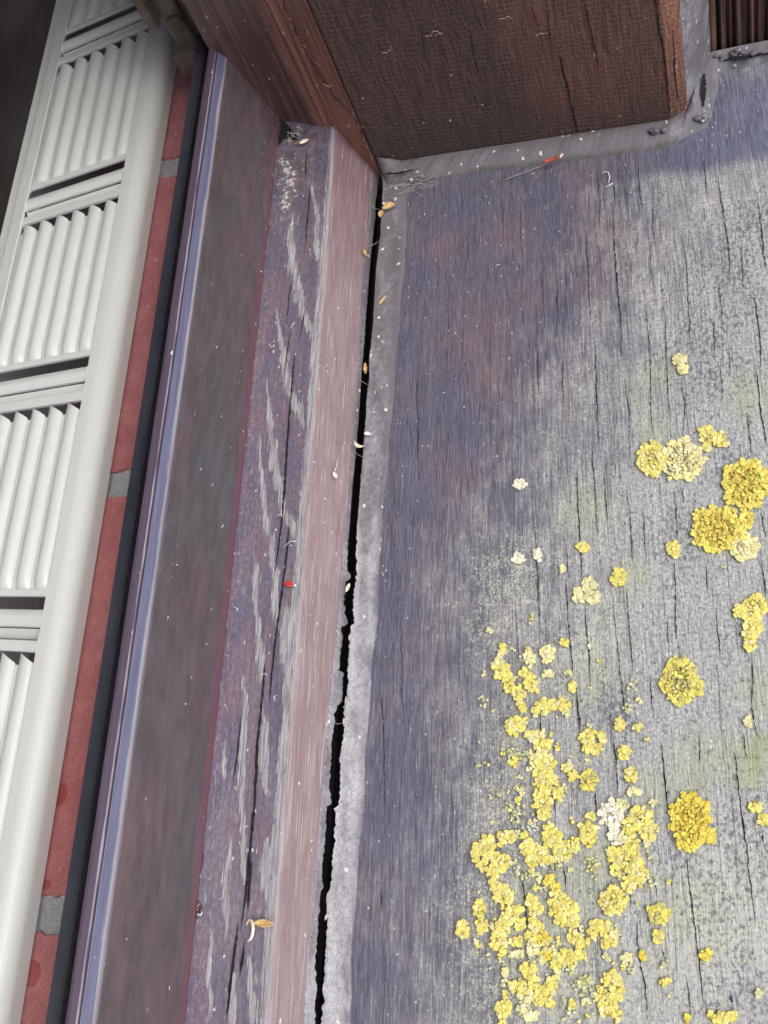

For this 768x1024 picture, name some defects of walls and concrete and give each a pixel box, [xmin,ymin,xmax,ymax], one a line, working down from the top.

crack [225,285,305,1024]
crack [349,189,383,644]